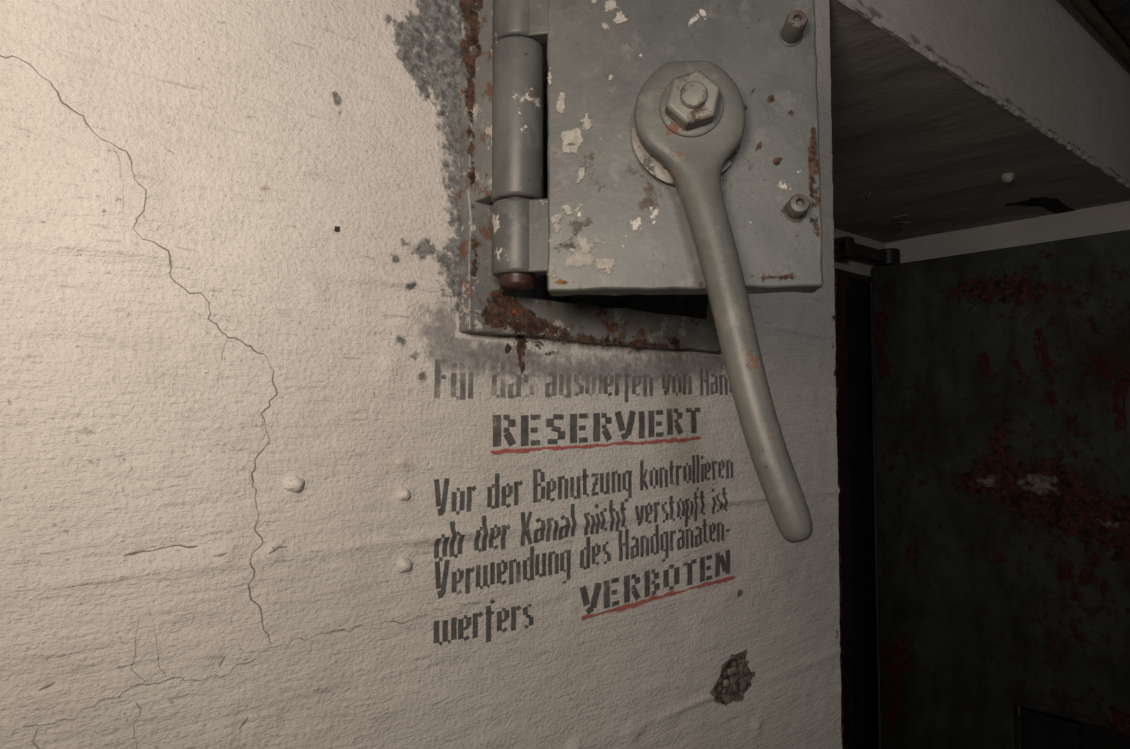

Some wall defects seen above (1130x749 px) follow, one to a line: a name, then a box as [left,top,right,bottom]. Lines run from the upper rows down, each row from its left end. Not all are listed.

corrosion [459,0,483,191]
peeling [392,238,447,263]
corrosion [470,237,479,281]
crack [0,55,277,644]
spalling [710,650,755,705]